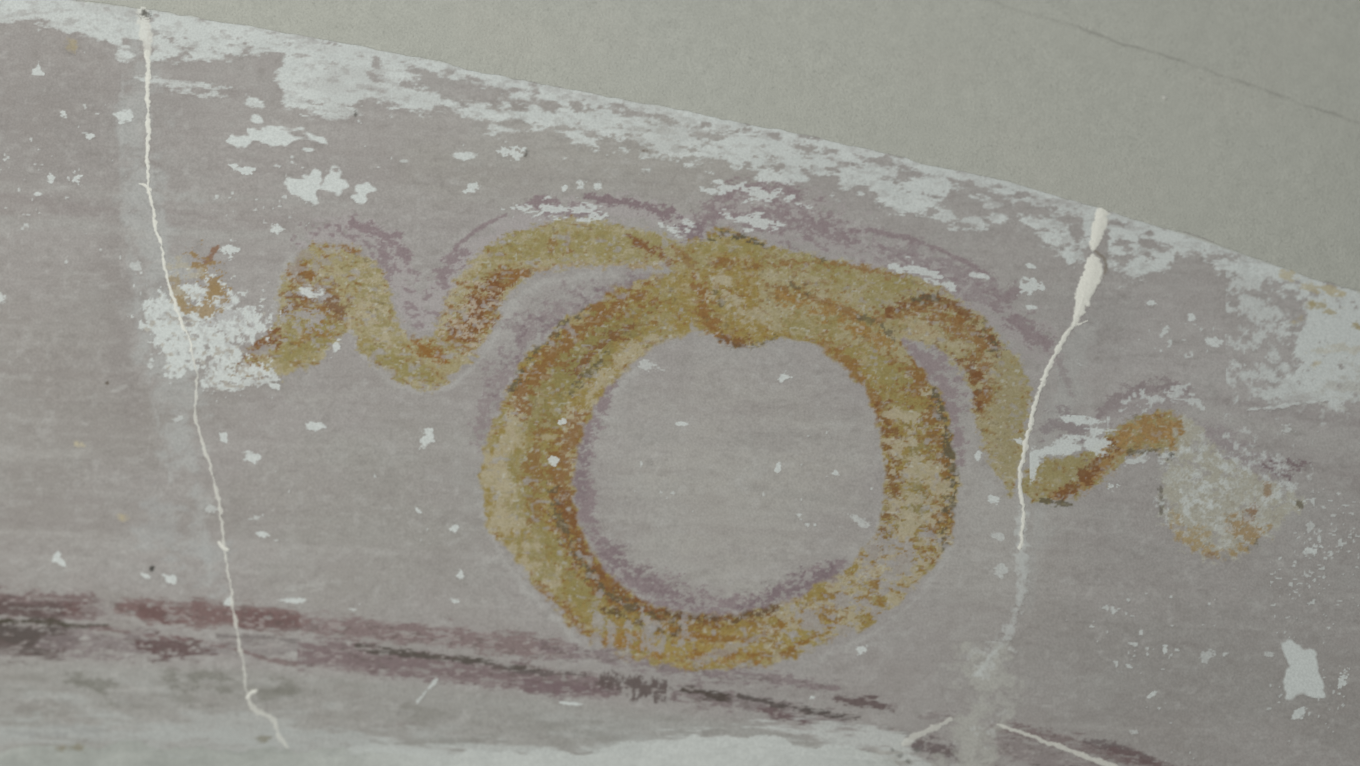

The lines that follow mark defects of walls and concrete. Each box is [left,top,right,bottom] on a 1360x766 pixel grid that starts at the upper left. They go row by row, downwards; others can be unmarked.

crack [986,0,1360,124]
peeling [0,0,1360,557]
crack [134,8,290,750]
crack [973,207,1112,678]
crack [901,716,954,747]
crack [996,723,1118,766]
peeling [1260,638,1350,720]